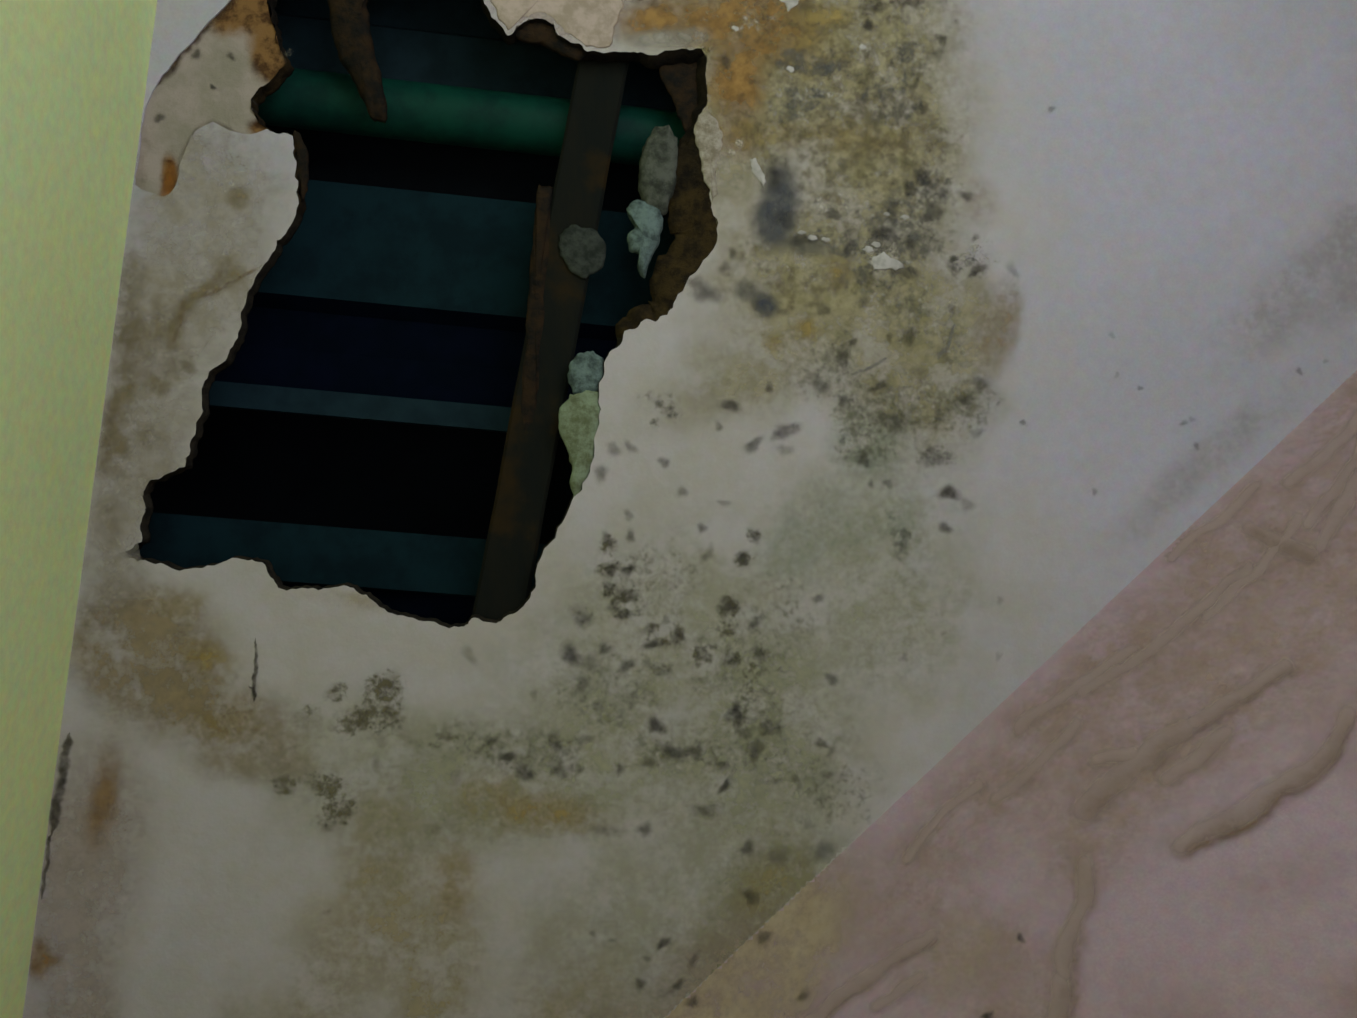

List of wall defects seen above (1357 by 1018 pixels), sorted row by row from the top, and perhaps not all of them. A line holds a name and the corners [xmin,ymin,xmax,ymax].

peeling [135,0,290,196]
water stain [518,12,569,35]
rust [627,0,843,112]
spalling [694,110,723,201]
water stain [639,0,1012,431]
water stain [79,135,266,736]
water stain [599,535,632,617]
water stain [341,675,402,735]
water stain [317,776,376,826]
water stain [394,596,845,1018]